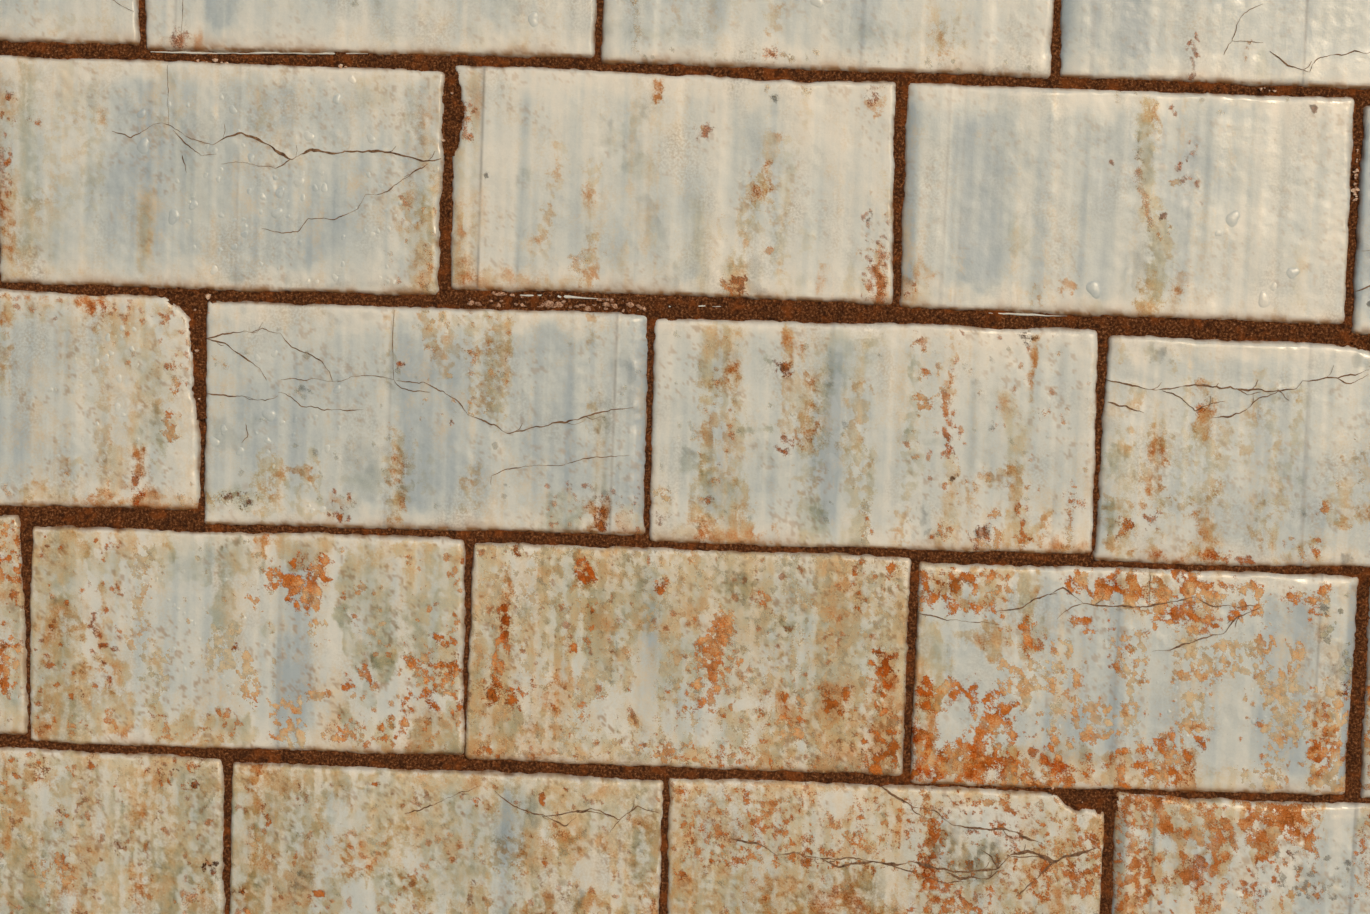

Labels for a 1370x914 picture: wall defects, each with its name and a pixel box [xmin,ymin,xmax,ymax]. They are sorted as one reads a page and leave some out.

crack [1224,4,1370,72]
crack [113,66,441,233]
corrosion [160,411,181,442]
crack [206,310,633,441]
corrosion [914,390,956,459]
crack [1106,366,1367,418]
corrosion [131,464,146,506]
corrosion [205,491,251,511]
corrosion [1061,486,1085,552]
crack [919,575,1260,651]
corrosion [0,501,1370,914]
crack [731,786,1100,897]